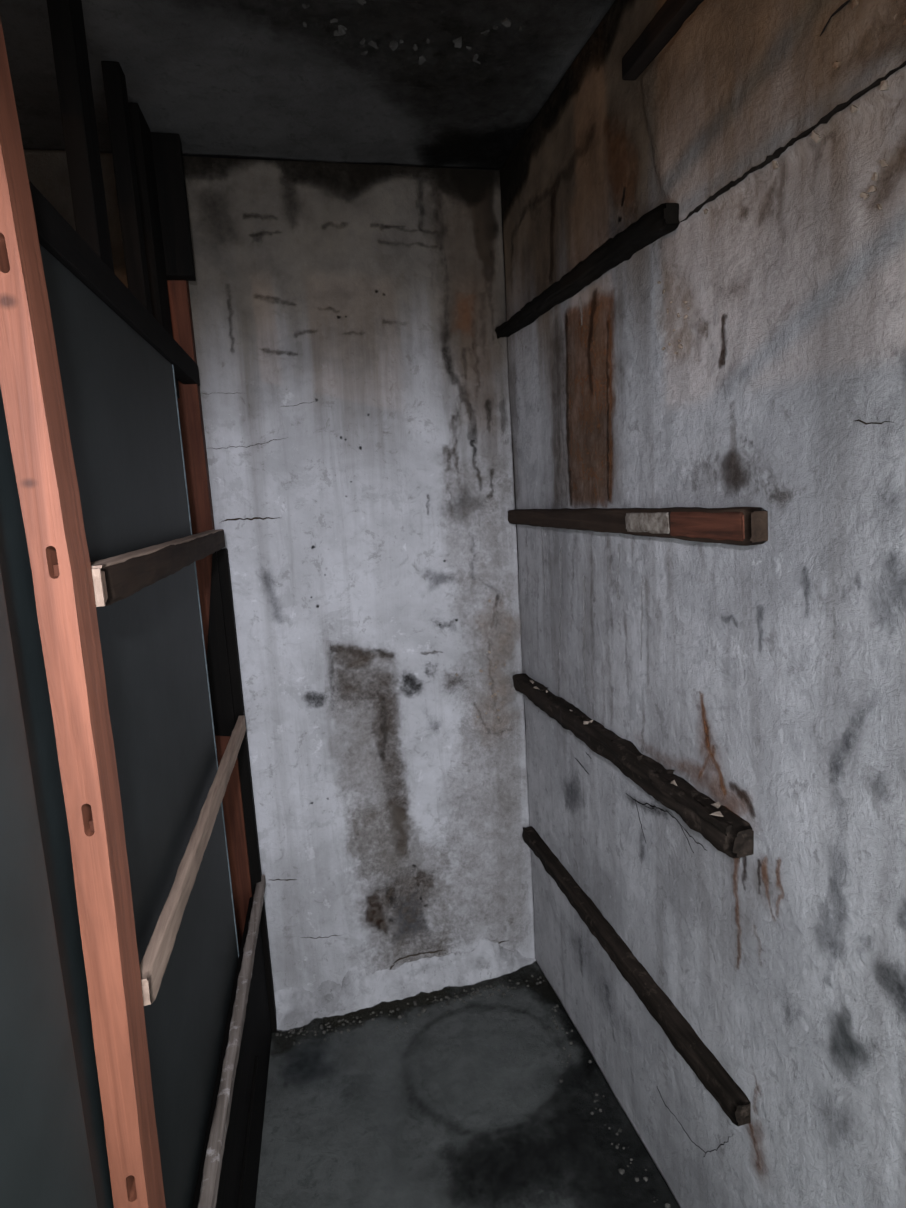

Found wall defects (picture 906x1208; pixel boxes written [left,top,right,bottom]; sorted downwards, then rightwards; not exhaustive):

crack [678,61,906,223]
water stain [467,400,494,498]
corrosion [565,291,615,505]
water stain [336,646,430,944]
corrosion [694,694,755,816]
corrosion [733,857,783,964]
water stain [454,976,677,1208]
water stain [831,1019,866,1066]
water stain [881,966,906,1014]